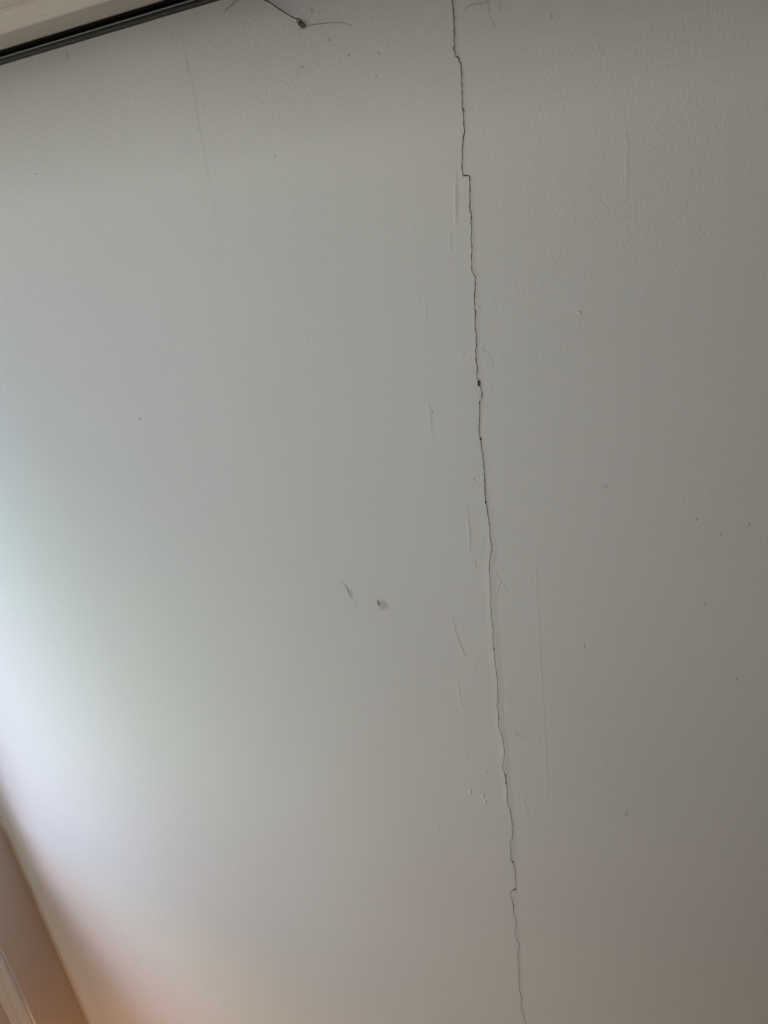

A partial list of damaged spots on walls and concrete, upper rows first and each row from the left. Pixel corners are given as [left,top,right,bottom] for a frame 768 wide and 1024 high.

crack [452,0,526,1022]